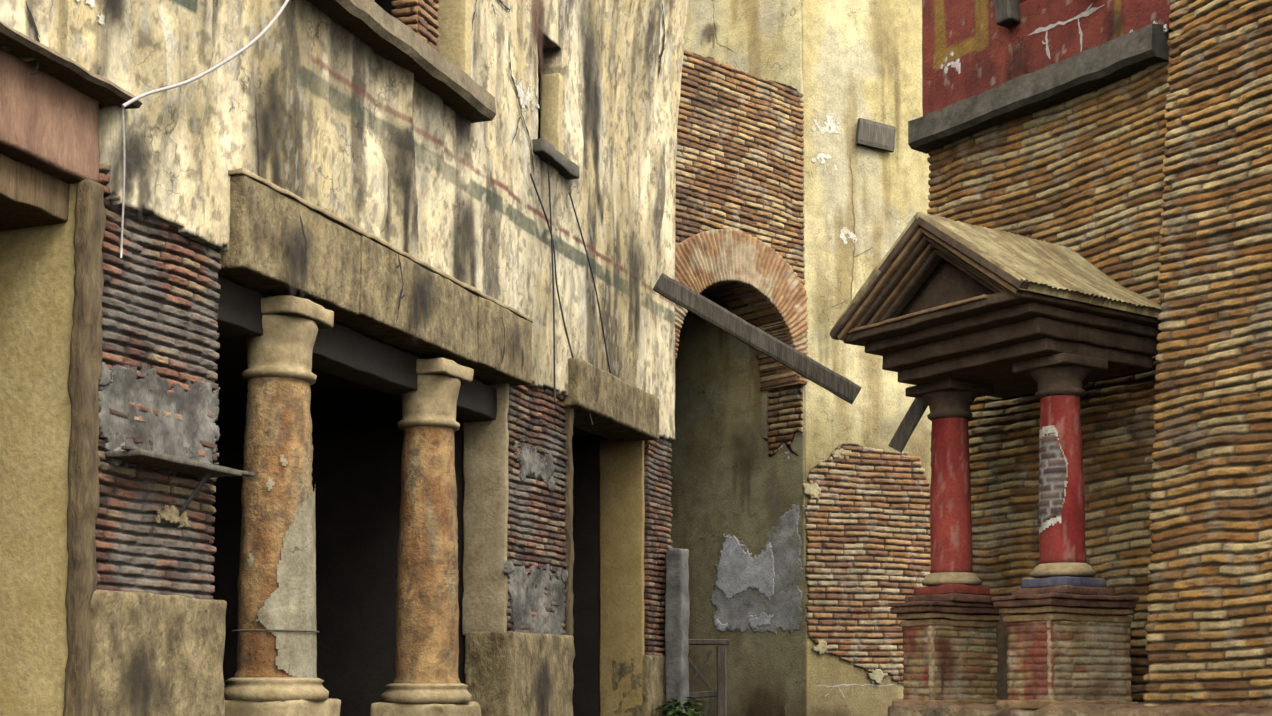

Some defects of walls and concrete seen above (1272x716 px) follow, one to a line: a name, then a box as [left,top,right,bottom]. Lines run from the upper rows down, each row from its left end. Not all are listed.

damp [106,0,123,20]
peeling [940,51,961,75]
damp [114,133,149,213]
damp [257,80,285,186]
damp [391,133,418,253]
damp [455,205,475,287]
peeling [99,362,112,386]
peeling [108,442,130,466]
spalling [1038,425,1068,535]
spalling [710,443,931,684]